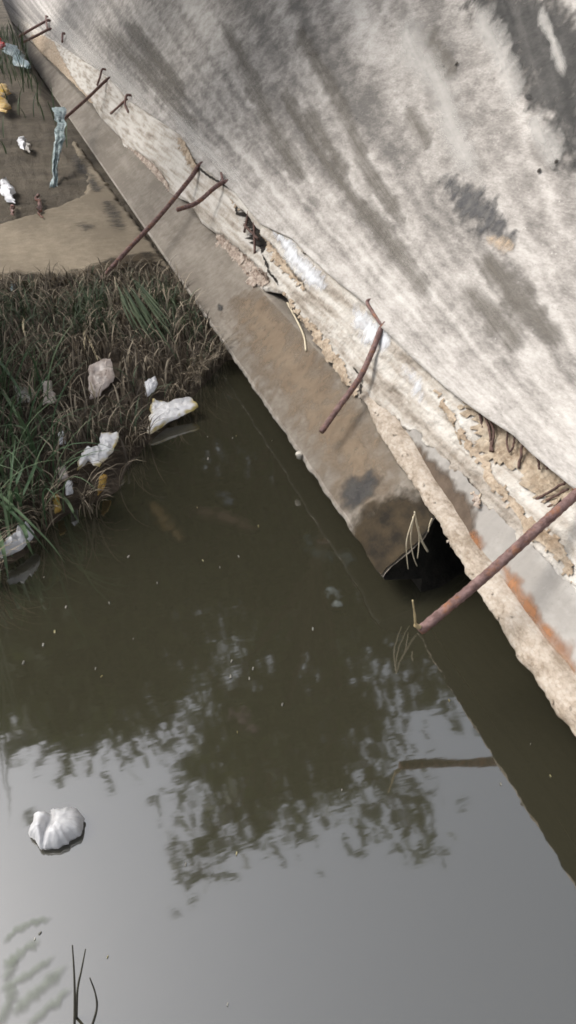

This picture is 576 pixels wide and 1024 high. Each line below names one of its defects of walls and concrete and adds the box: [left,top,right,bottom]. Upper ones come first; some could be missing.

spalling [30,34,93,103]
spalling [177,138,199,173]
leakage [438,175,516,246]
spalling [215,233,359,397]
spalling [433,389,574,583]
corrosion [506,575,568,659]